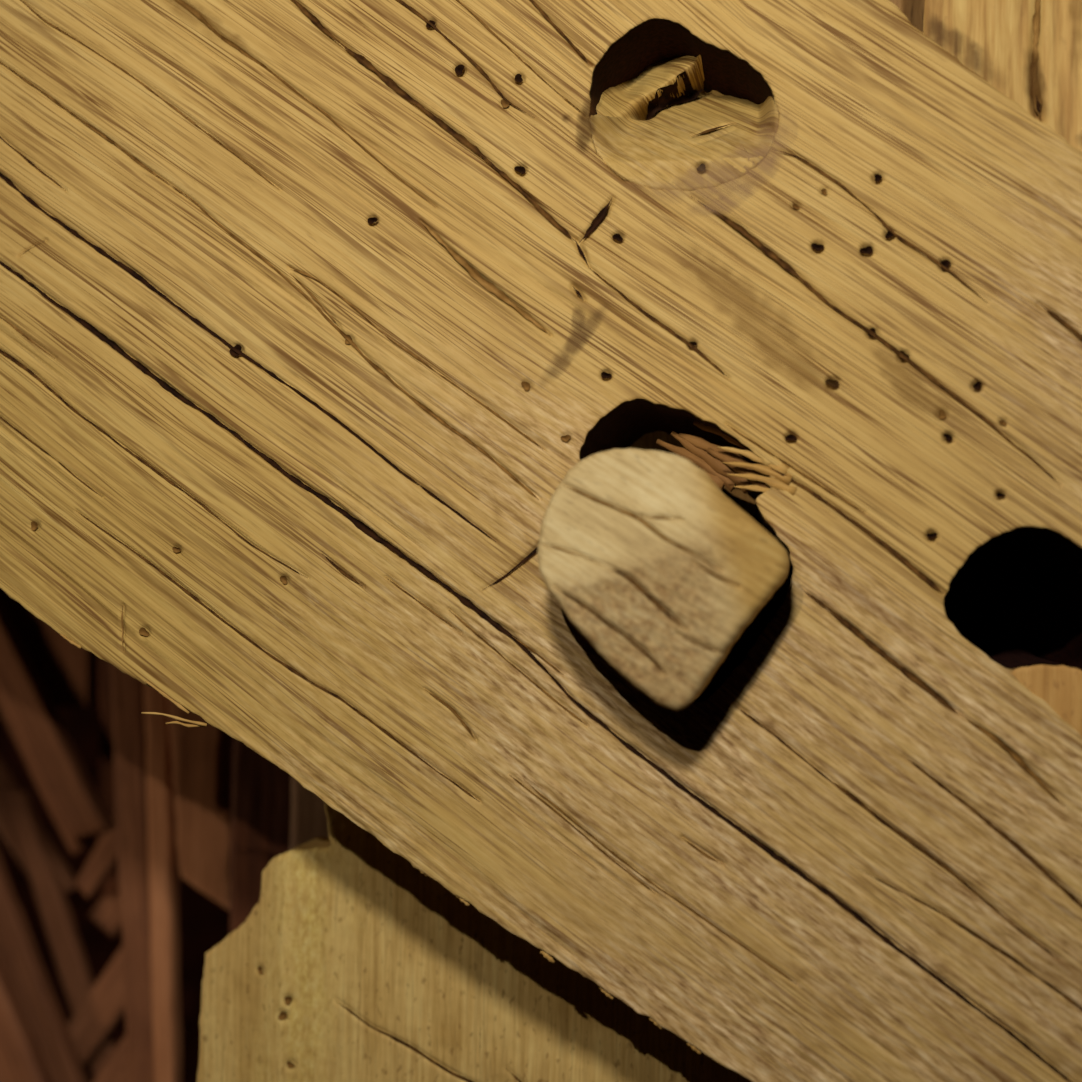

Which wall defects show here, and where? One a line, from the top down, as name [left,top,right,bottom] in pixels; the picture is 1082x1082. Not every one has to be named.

crack [0,61,543,542]
crack [176,0,549,334]
crack [292,0,733,378]
crack [691,196,1061,485]
crack [772,149,988,303]
crack [0,240,1082,1082]